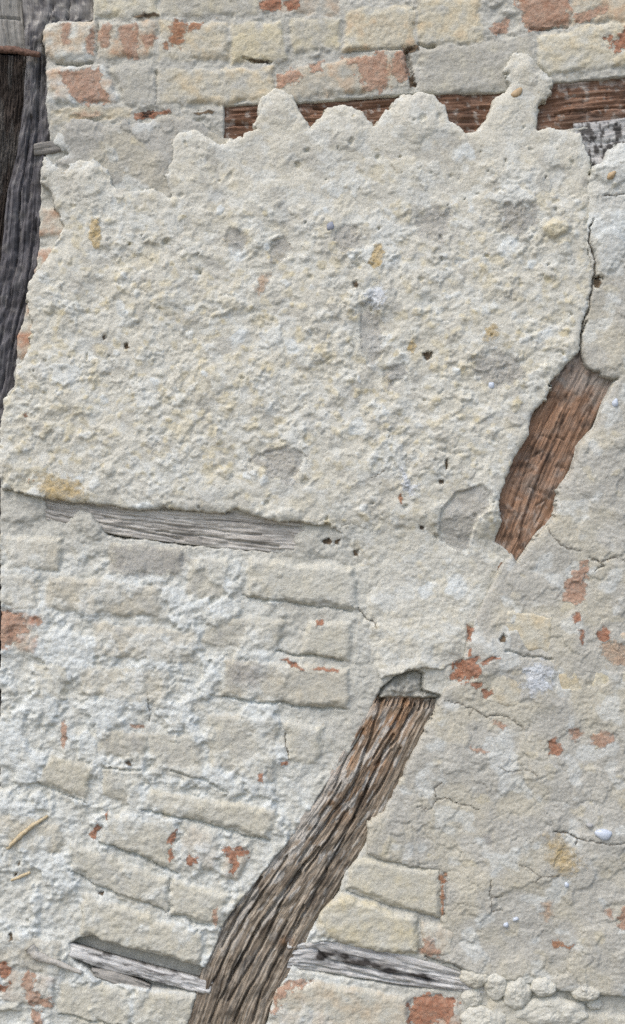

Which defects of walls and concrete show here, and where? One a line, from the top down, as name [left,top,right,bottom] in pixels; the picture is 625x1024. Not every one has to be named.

peeling [259,0,300,12]
peeling [489,0,608,35]
peeling [603,26,625,53]
peeling [59,22,157,118]
peeling [276,60,324,88]
peeling [341,50,417,95]
peeling [134,109,170,120]
crack [579,194,621,352]